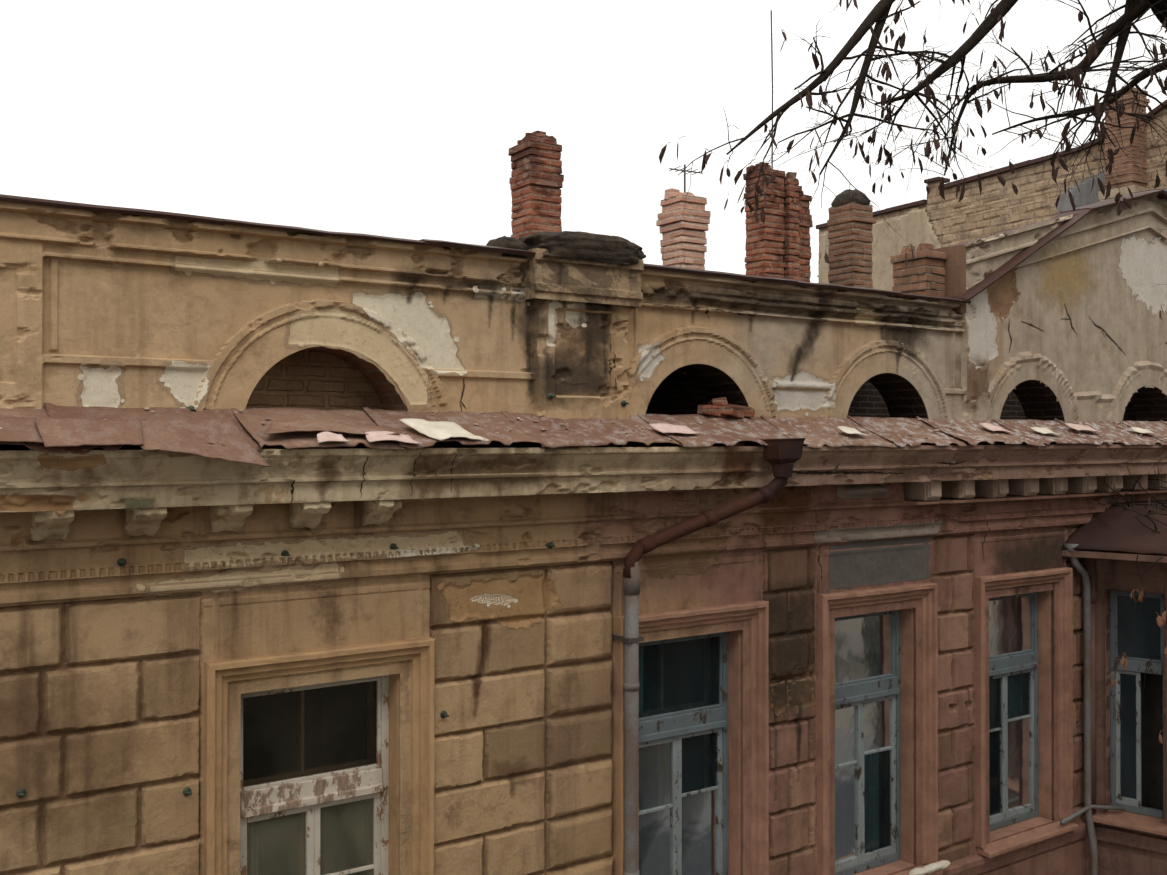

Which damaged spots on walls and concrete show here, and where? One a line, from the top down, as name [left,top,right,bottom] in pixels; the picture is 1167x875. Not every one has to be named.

peeling [1117,233,1167,319]
peeling [169,251,469,411]
peeling [76,359,126,408]
peeling [156,357,214,411]
peeling [771,369,838,416]
peeling [136,529,480,600]
spalling [437,568,563,630]